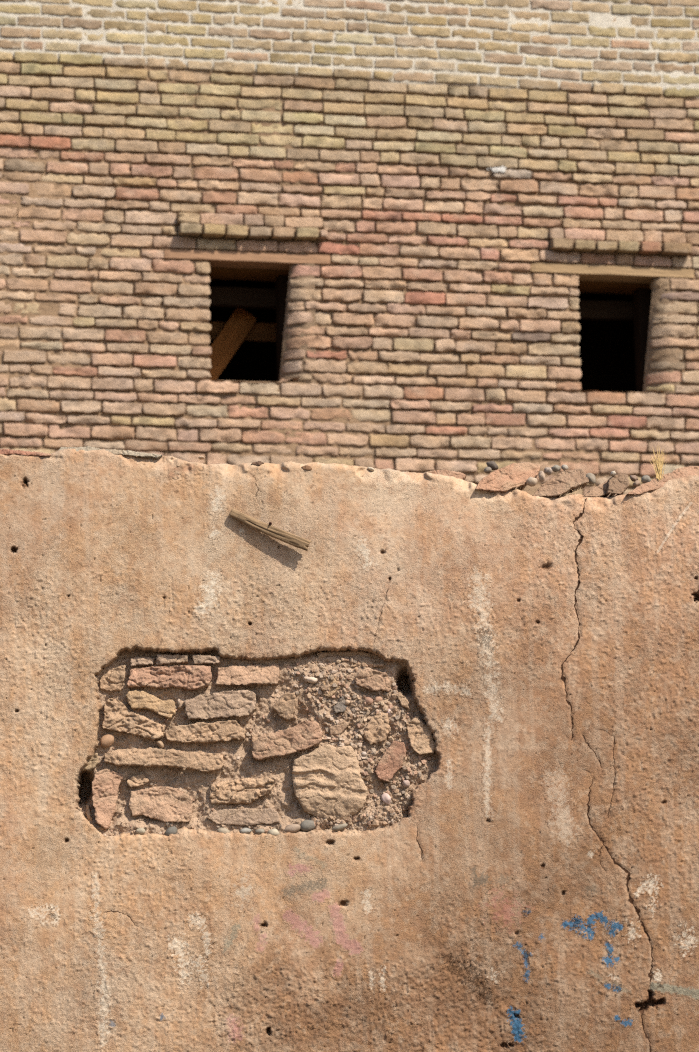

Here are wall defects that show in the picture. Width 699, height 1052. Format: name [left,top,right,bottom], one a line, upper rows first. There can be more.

spalling [79,649,438,846]
crack [561,498,653,988]